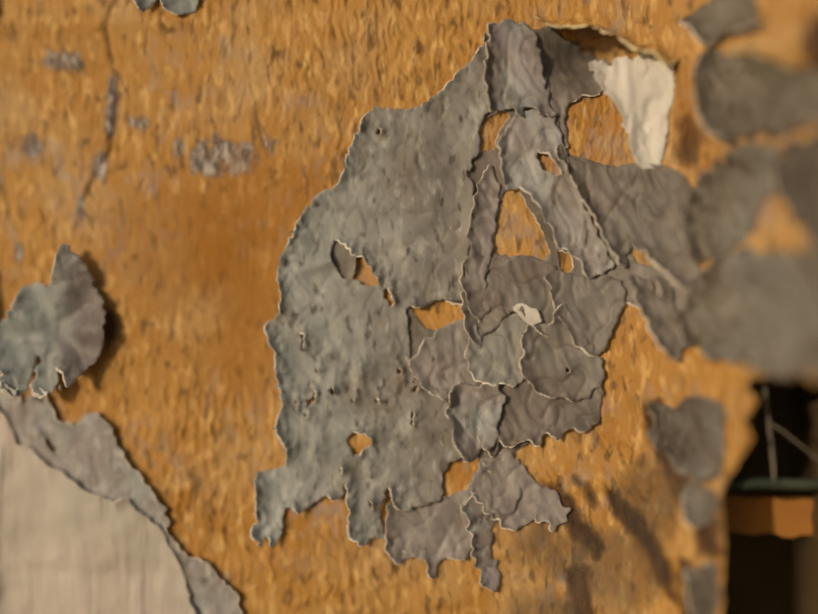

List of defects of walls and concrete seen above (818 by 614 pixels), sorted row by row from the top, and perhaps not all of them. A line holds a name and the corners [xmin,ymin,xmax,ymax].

peeling [133,0,199,15]
crack [79,0,129,227]
peeling [0,243,106,400]
peeling [250,0,818,593]
peeling [0,411,197,614]